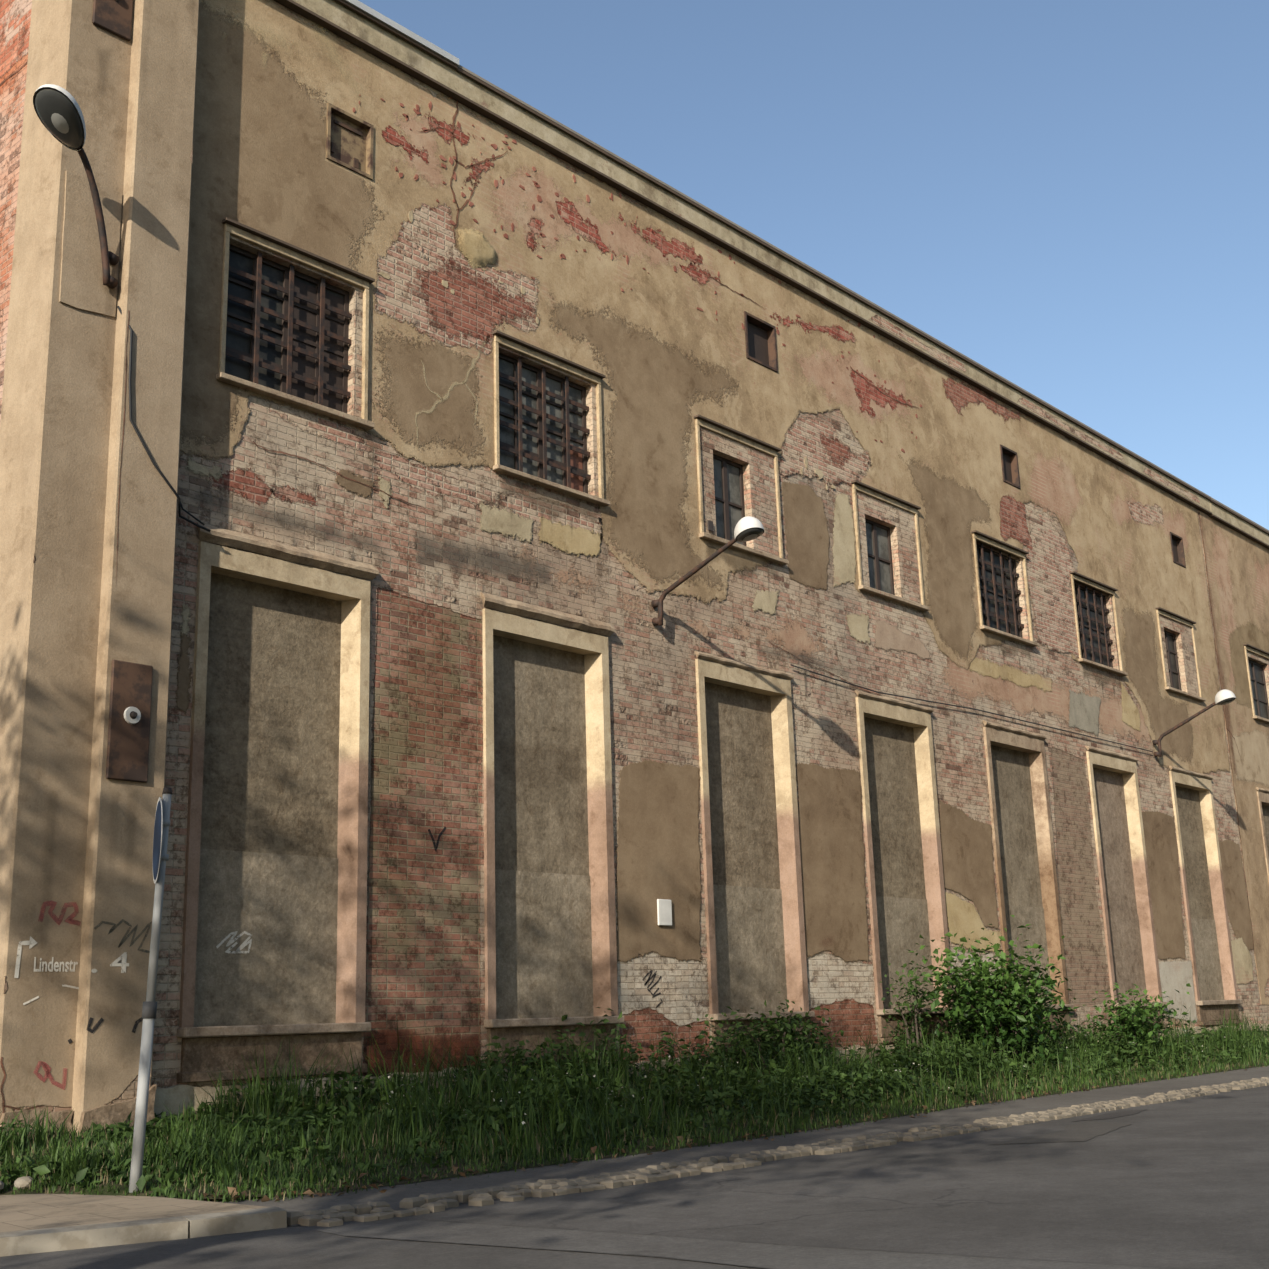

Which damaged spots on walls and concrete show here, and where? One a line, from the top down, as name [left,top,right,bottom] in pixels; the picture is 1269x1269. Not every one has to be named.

crack [416,101,507,245]
spalling [373,98,744,354]
crack [415,335,490,449]
spalling [770,313,1124,490]
spalling [210,467,318,507]
spalling [497,491,602,534]
spalling [999,494,1079,658]
peeling [617,952,711,1063]
peeling [807,952,878,1048]